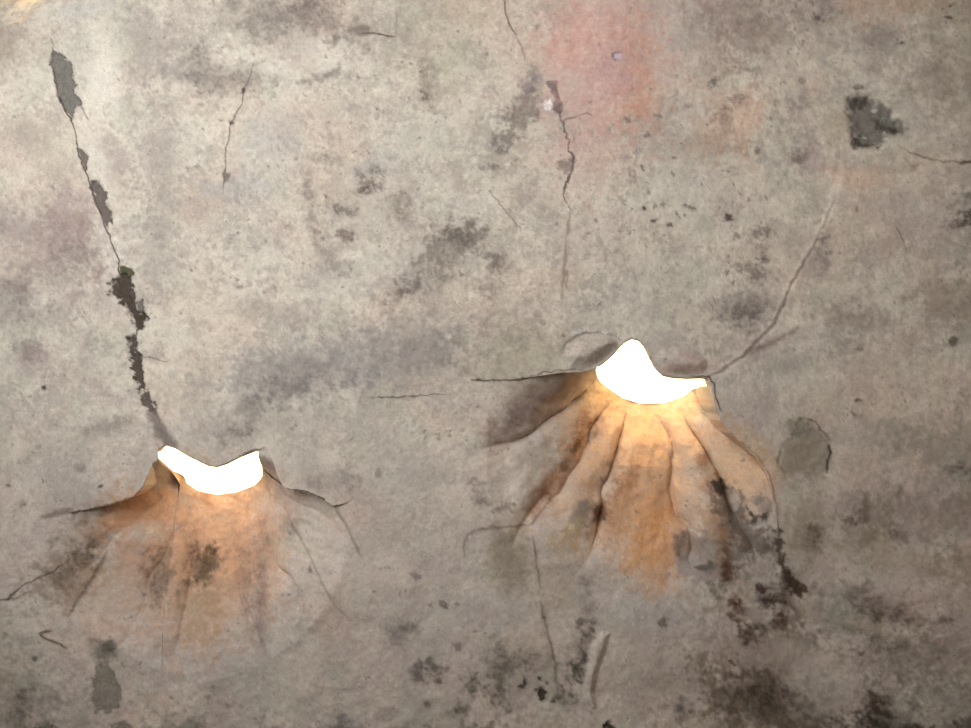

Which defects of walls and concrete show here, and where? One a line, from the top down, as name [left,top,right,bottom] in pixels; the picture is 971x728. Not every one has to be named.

crack [223,80,249,186]
spalling [847,97,904,148]
crack [546,80,591,287]
crack [49,51,175,446]
crack [744,267,801,354]
crack [695,375,721,411]
crack [0,567,58,600]